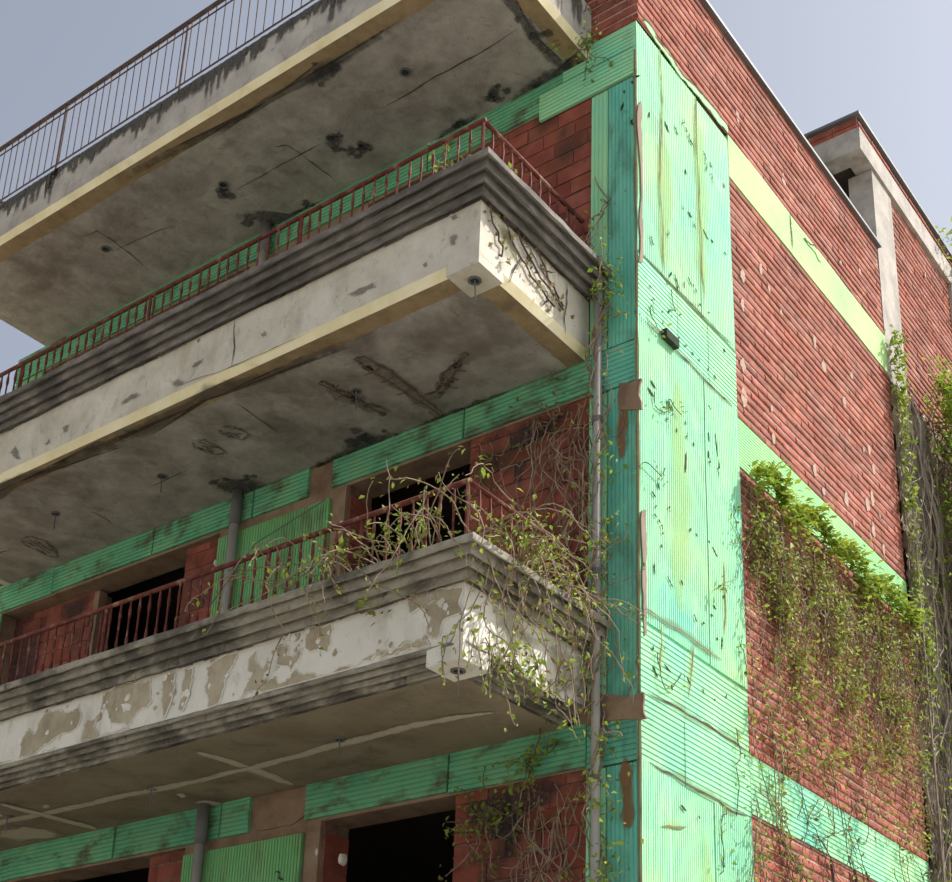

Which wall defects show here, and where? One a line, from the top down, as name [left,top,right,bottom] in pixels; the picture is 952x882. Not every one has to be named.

water stain [0,0,380,216]
crack [382,29,517,109]
water stain [439,117,475,139]
water stain [243,200,322,227]
peeling [617,378,673,421]
peeling [204,587,464,708]
peeling [0,667,194,765]